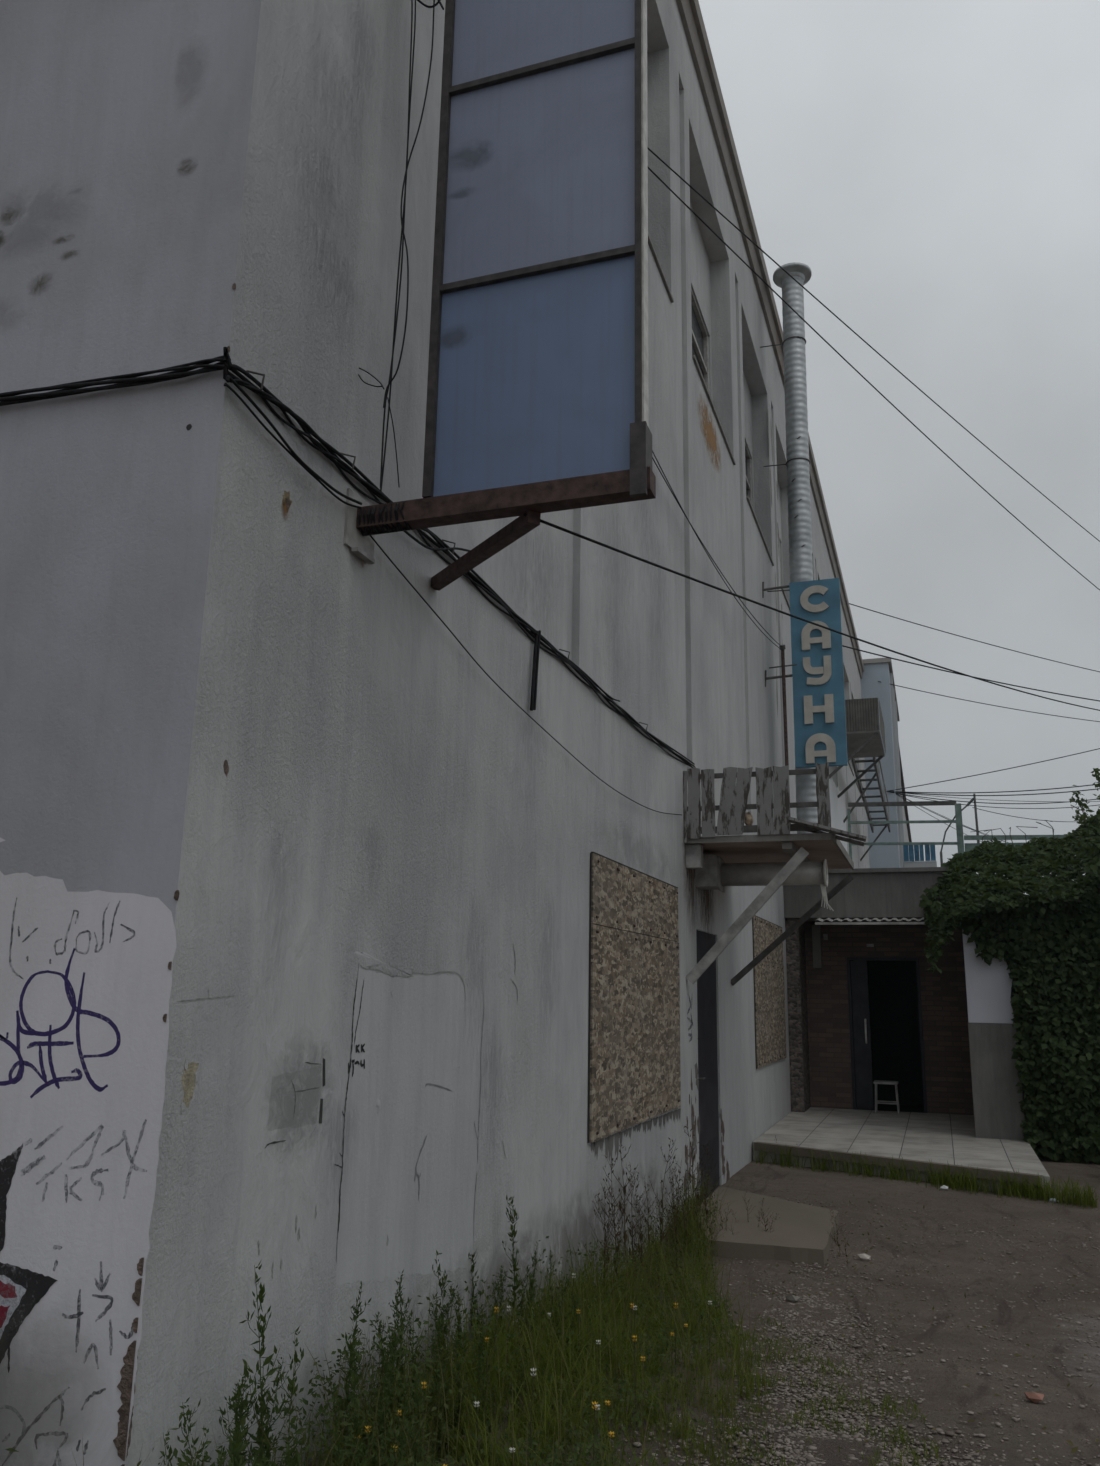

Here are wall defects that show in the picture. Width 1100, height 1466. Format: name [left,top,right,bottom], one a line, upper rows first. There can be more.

spalling [113,1258,144,1466]